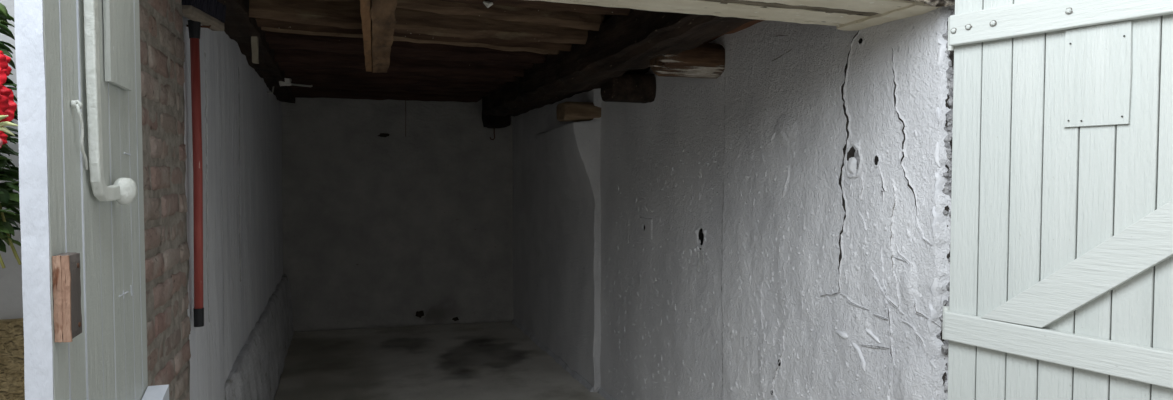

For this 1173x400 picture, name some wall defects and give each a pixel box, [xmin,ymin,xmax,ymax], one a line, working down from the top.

spalling [844,141,881,179]
crack [821,30,941,369]
spalling [924,0,955,237]
peeling [835,330,866,372]
spalling [926,278,950,400]